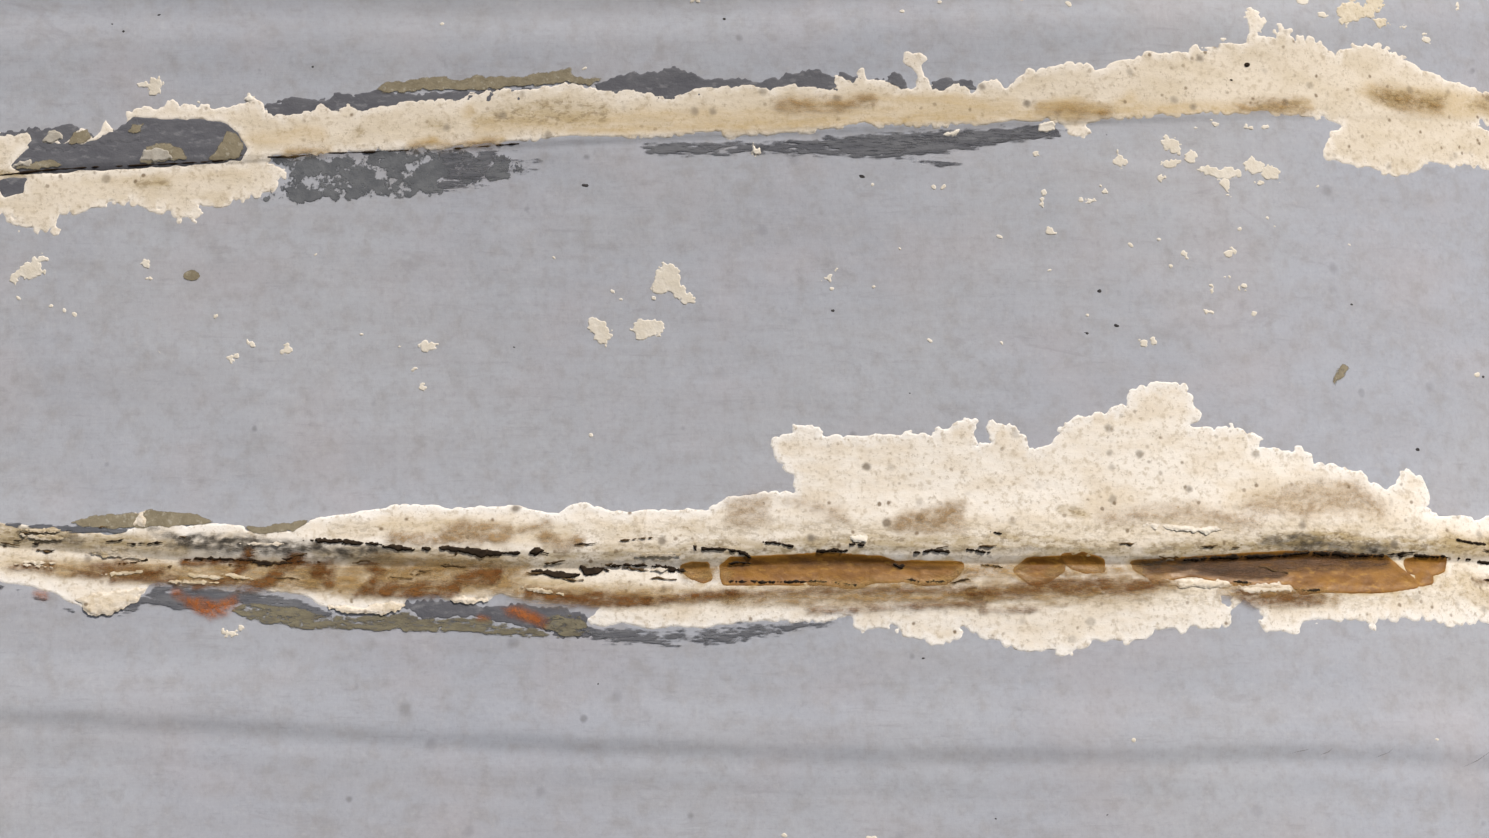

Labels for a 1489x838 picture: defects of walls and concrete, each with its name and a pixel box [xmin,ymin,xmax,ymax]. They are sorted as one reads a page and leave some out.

peeling [0,0,1489,236]
peeling [9,253,49,300]
peeling [650,262,696,305]
peeling [1203,227,1247,315]
peeling [587,317,665,348]
crack [0,532,54,553]
crack [99,526,1003,586]
corrosion [13,549,1388,623]
peeling [0,381,1489,659]
crack [1118,538,1489,592]